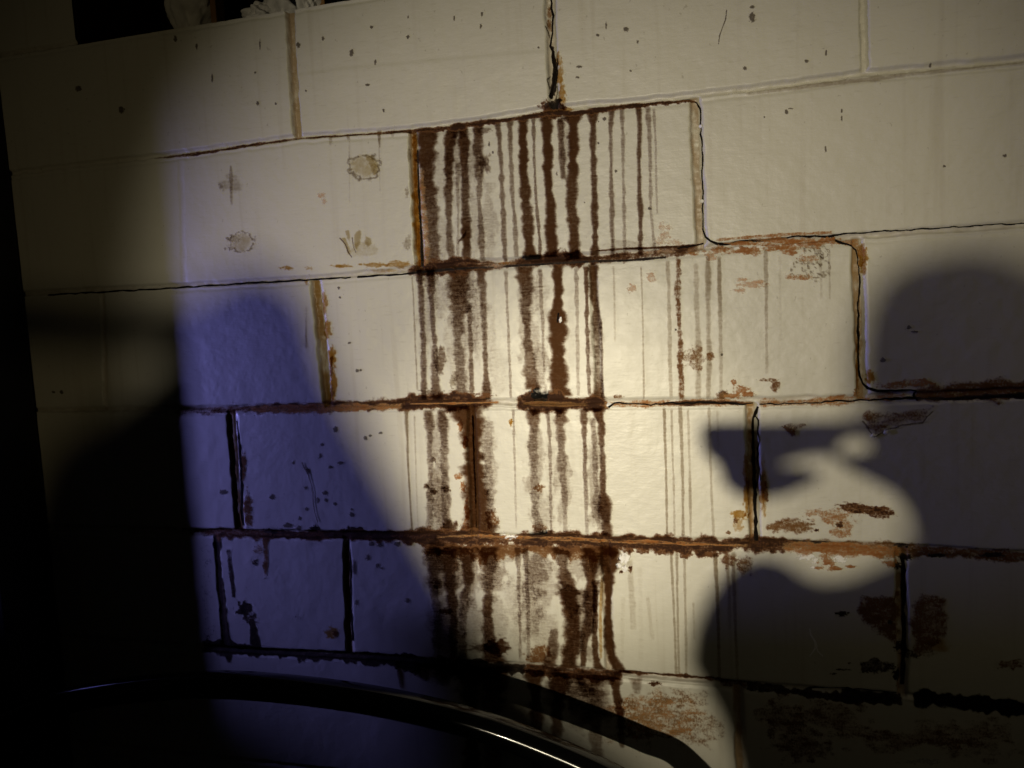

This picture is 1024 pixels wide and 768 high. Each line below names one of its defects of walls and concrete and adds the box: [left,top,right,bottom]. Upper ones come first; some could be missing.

crack [545,0,558,101]
rust [175,46,1024,747]
crack [608,99,1024,541]